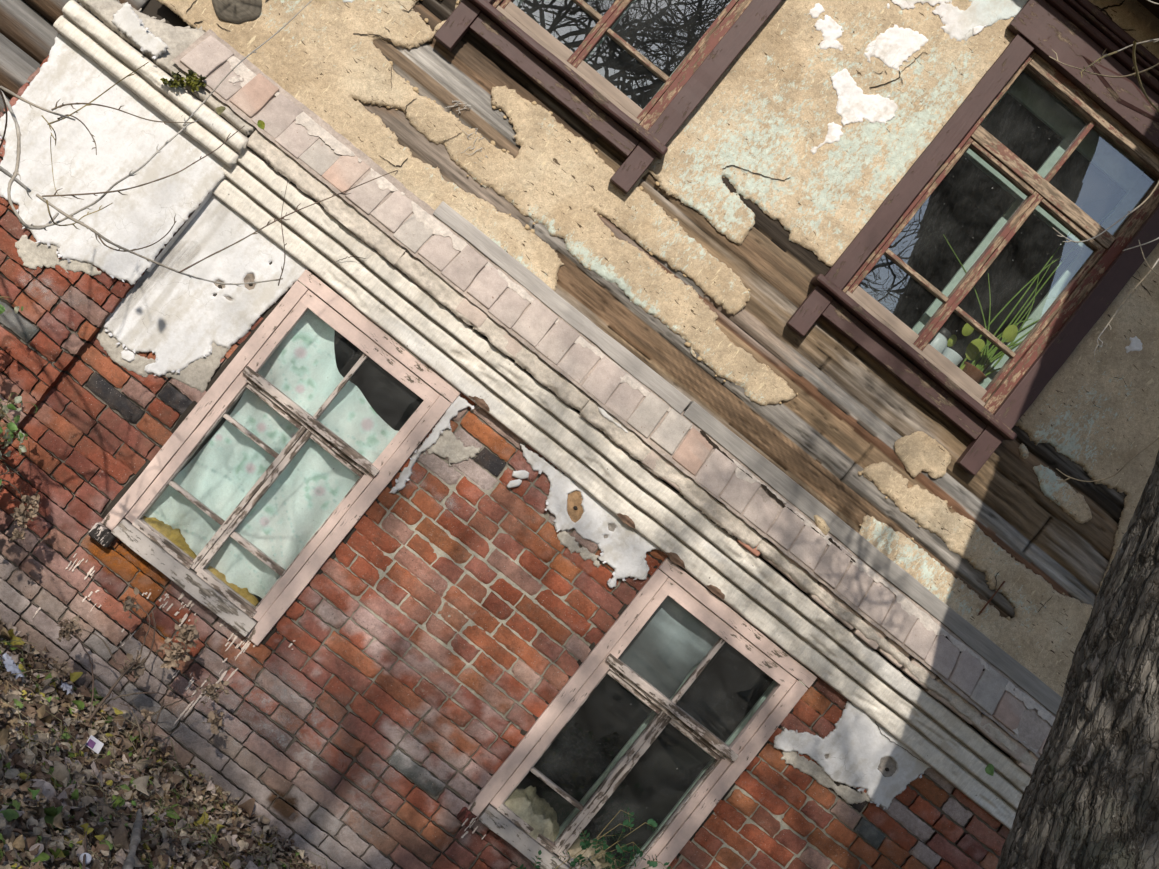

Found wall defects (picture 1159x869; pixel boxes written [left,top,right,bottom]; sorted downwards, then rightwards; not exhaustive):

flaking render [111,2,170,60]
flaking render [373,0,634,172]
peeling [809,3,844,51]
peeling [810,68,898,155]
peeling [864,24,928,71]
peeling [887,0,1028,42]
flaking render [0,33,309,377]
spalling [246,99,1127,771]
flaking render [774,701,931,810]